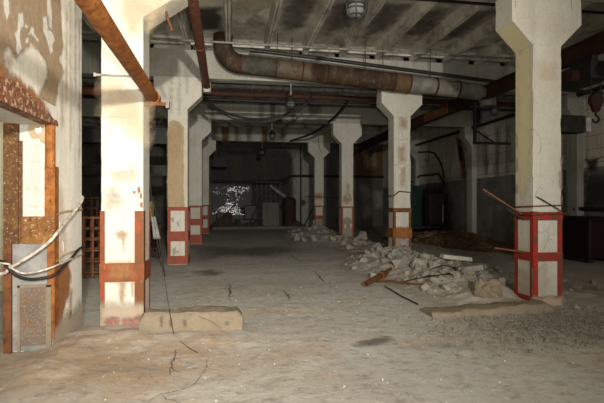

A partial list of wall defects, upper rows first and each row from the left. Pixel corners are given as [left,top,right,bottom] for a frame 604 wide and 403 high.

rust [0,66,49,113]
peeling [0,0,63,106]